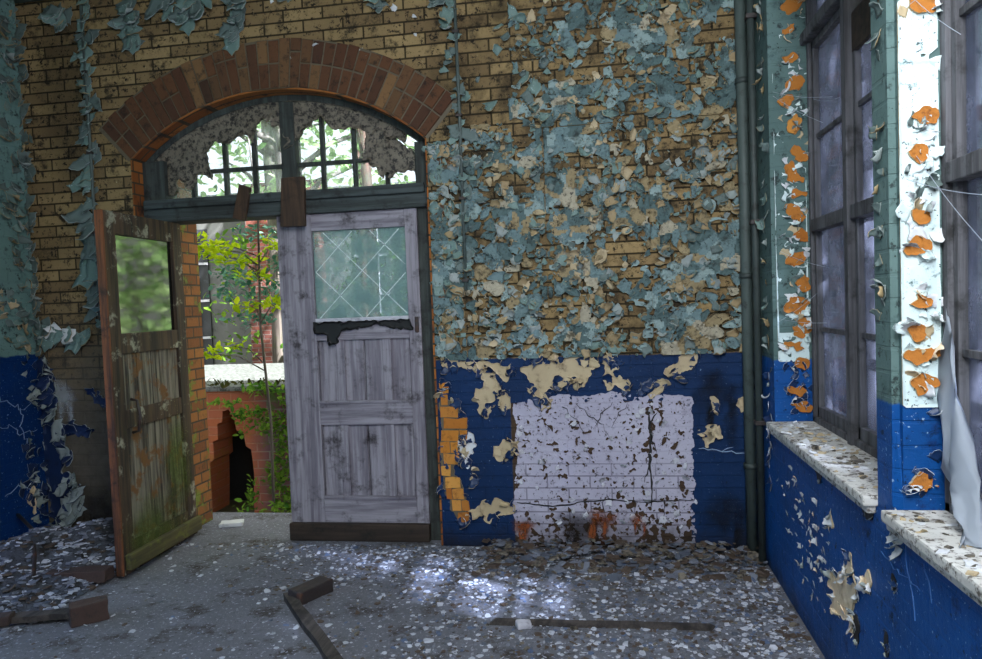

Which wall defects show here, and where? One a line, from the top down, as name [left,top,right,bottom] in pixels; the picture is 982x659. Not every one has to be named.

crack [0,399,36,442]
peeling [0,0,246,527]
peeling [421,0,742,530]
peeling [752,0,872,648]
peeling [892,0,946,416]
peeling [902,450,943,498]